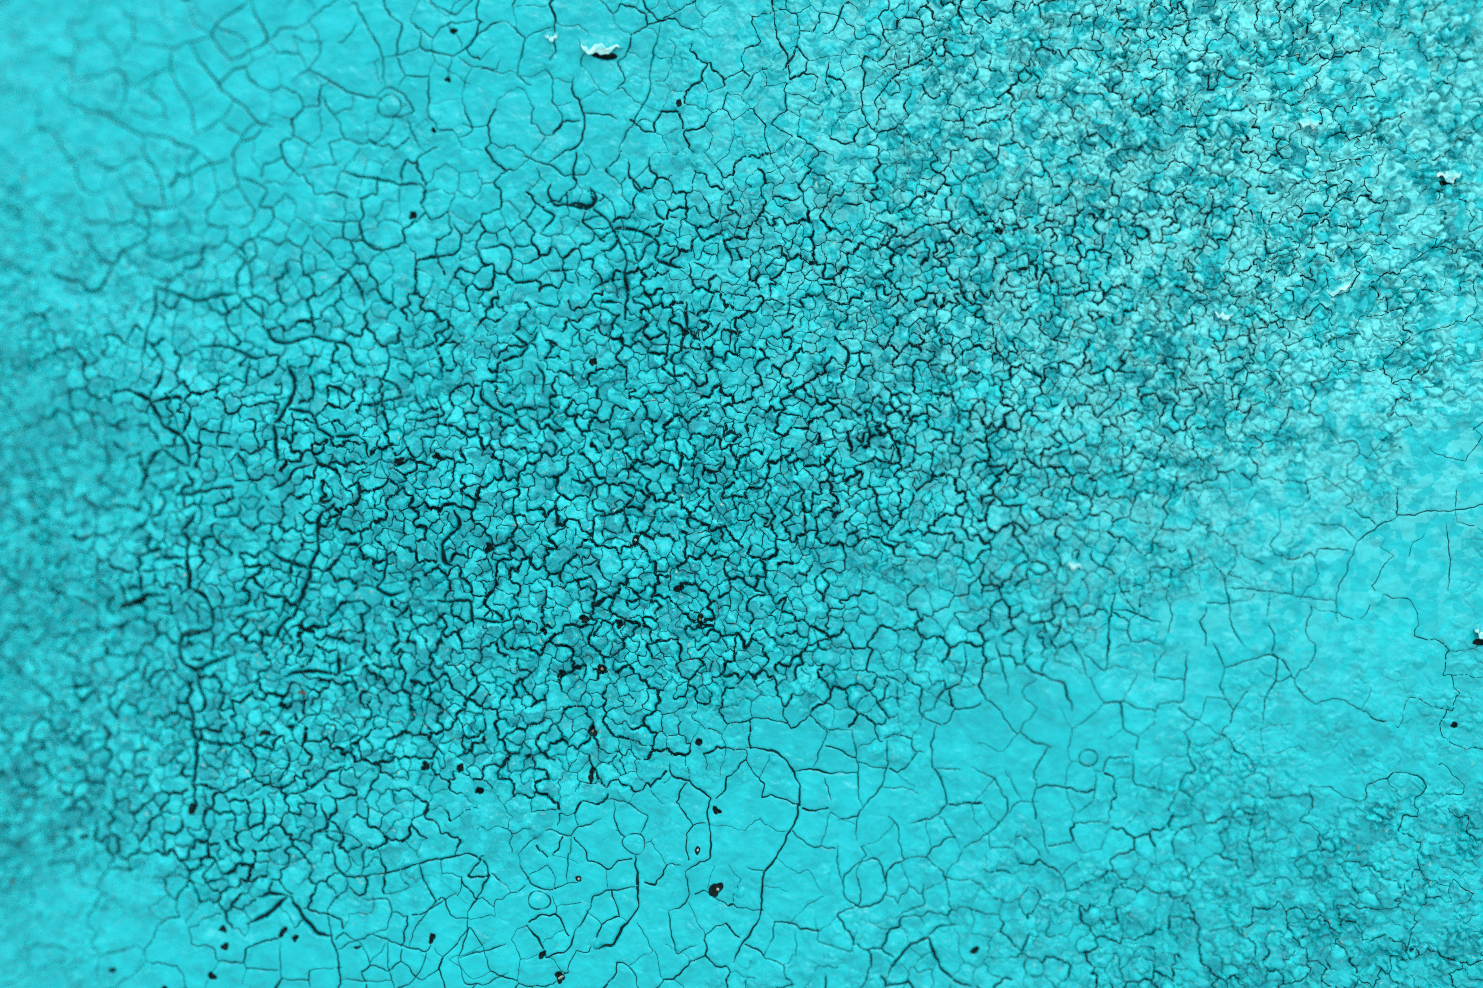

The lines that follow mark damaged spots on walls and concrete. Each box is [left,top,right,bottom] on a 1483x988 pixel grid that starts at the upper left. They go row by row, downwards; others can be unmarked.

crack [529,0,562,36]
crack [1322,0,1384,33]
crack [1402,32,1483,113]
crack [1432,113,1483,161]
crack [1444,524,1452,586]
crack [1387,595,1483,750]
crack [1439,763,1481,844]
crack [1321,771,1474,912]
crack [644,854,676,886]
crack [695,866,740,908]
crack [603,954,645,988]
crack [1040,956,1071,987]